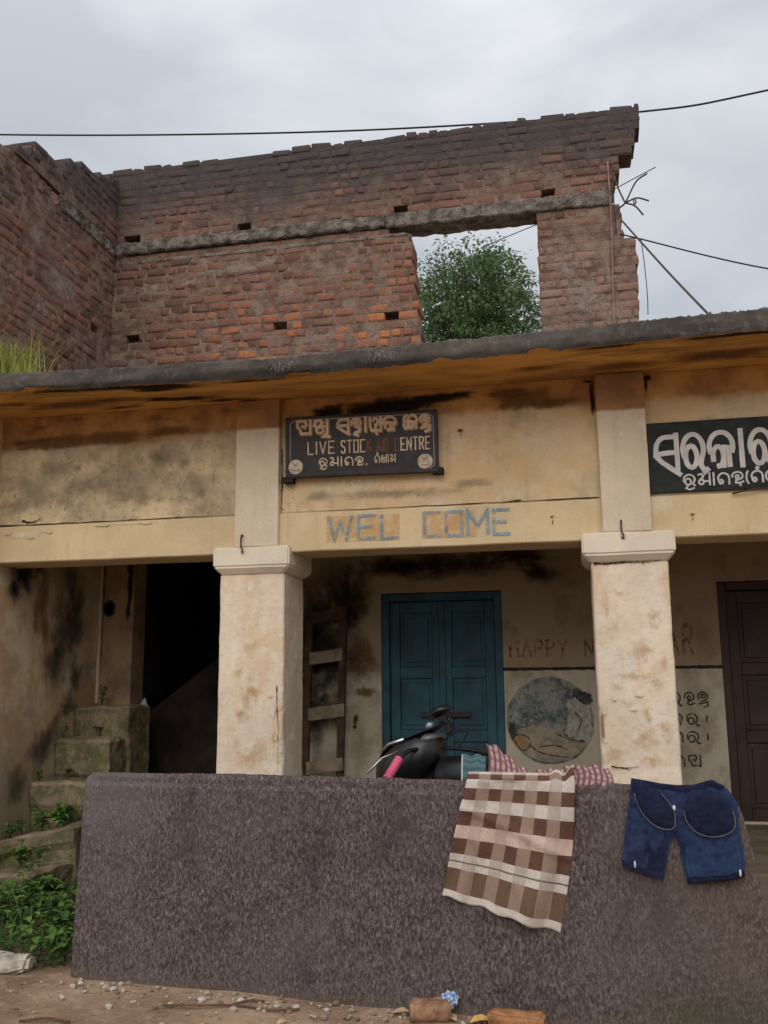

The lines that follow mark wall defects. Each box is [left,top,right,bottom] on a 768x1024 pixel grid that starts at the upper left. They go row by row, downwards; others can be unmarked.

damp [490,389,569,408]
damp [17,432,137,450]
damp [10,568,84,679]
damp [33,700,75,763]